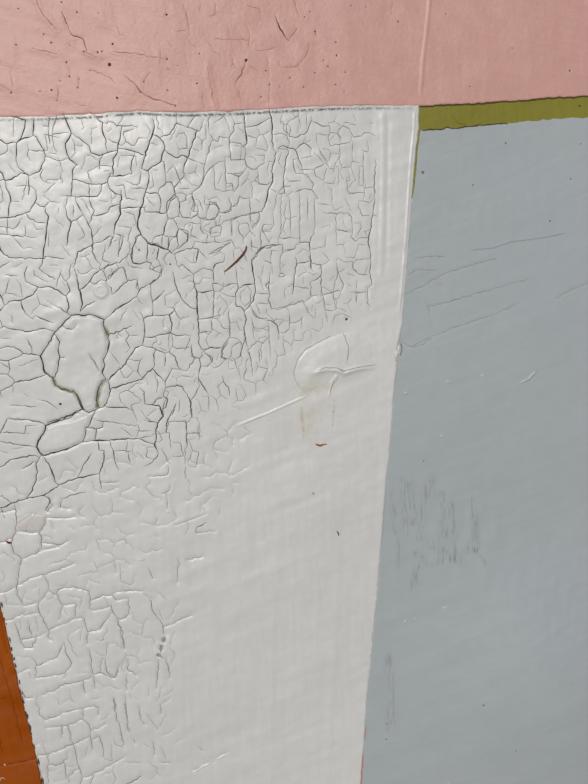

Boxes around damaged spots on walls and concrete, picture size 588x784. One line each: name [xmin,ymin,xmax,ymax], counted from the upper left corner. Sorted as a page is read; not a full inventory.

crack [0,0,377,784]